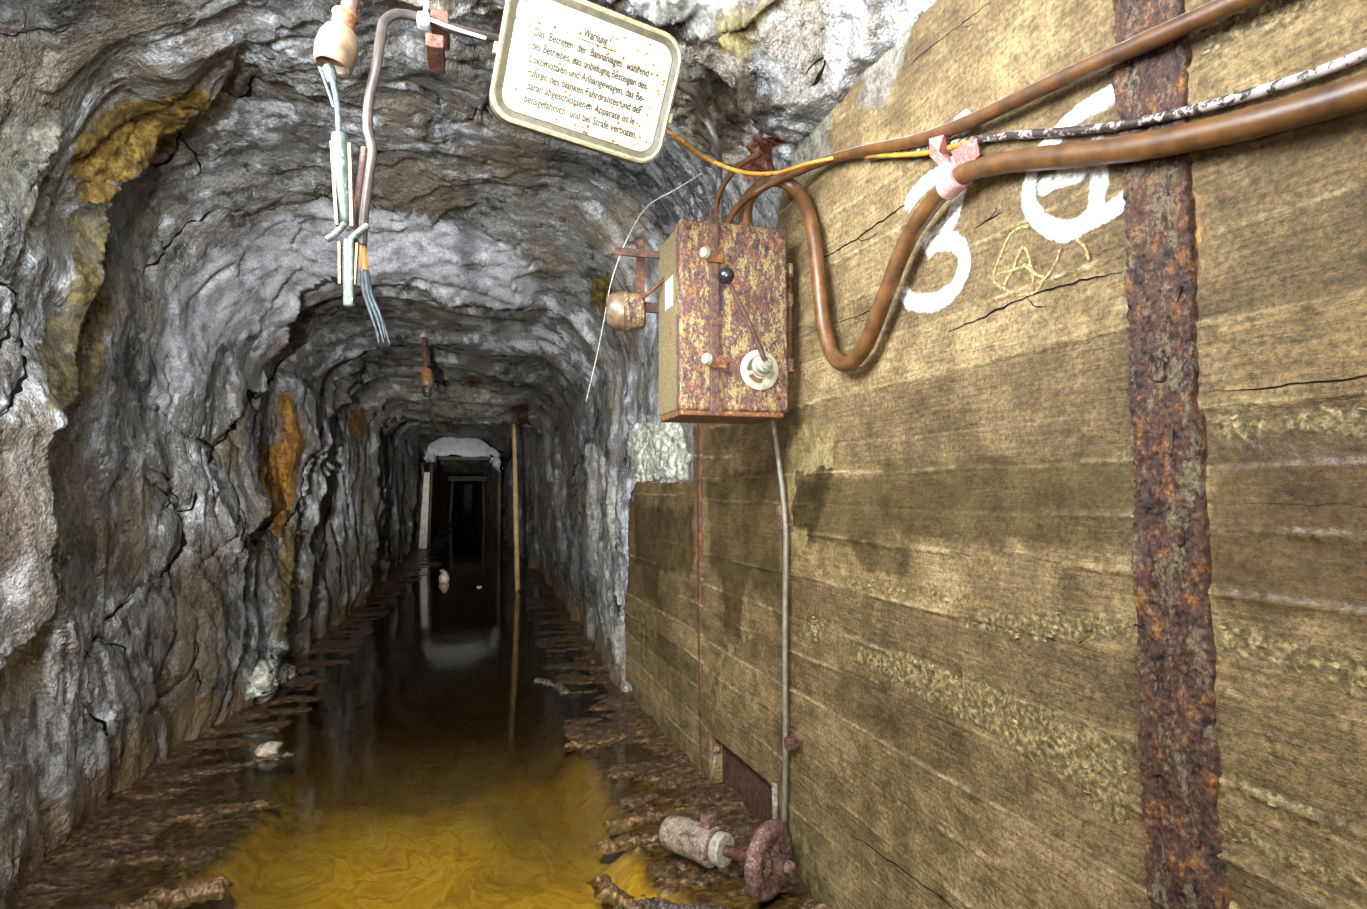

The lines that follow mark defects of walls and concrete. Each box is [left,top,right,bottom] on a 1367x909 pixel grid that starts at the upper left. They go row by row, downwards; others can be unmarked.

rust [1193,193,1206,262]
crack [1203,375,1367,393]
crack [847,832,954,909]